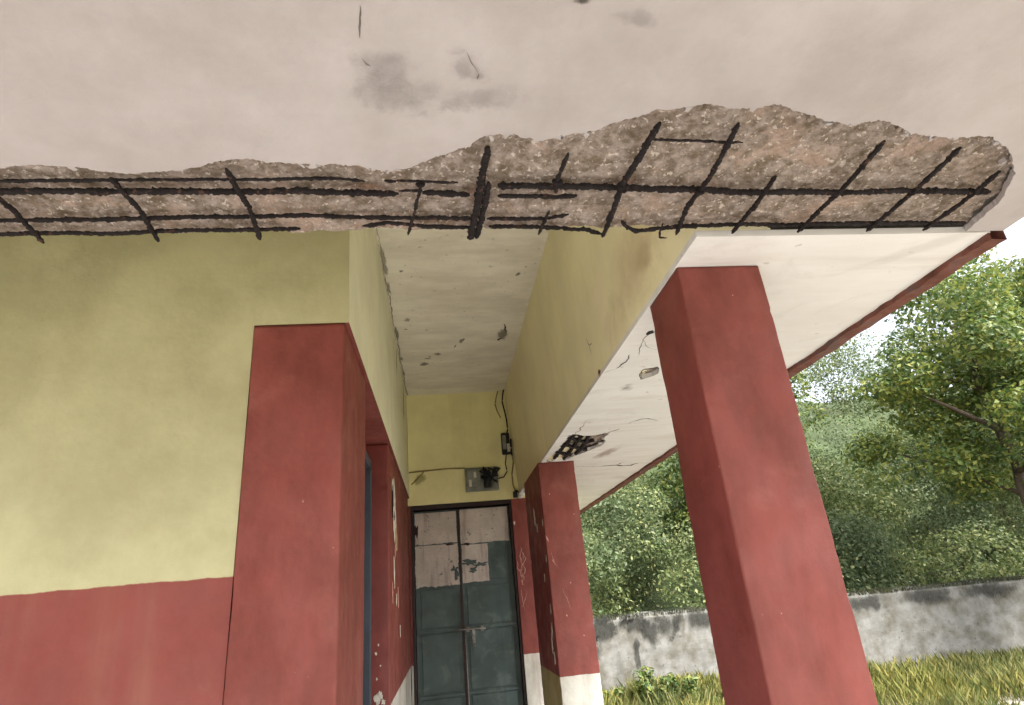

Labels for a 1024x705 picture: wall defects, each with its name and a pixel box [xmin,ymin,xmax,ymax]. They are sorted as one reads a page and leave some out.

crack [358,6,370,66]
spalling [0,104,1011,244]
crack [607,330,655,372]
spalling [548,426,618,462]